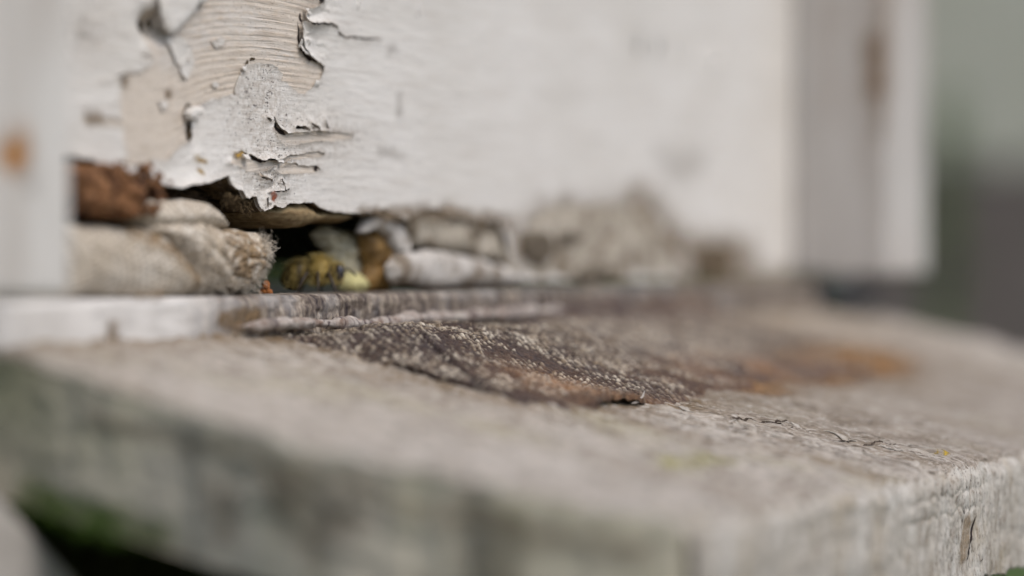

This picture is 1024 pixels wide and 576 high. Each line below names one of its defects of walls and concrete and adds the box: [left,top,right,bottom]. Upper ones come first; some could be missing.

peeling [82,0,324,173]
peeling [231,118,352,177]